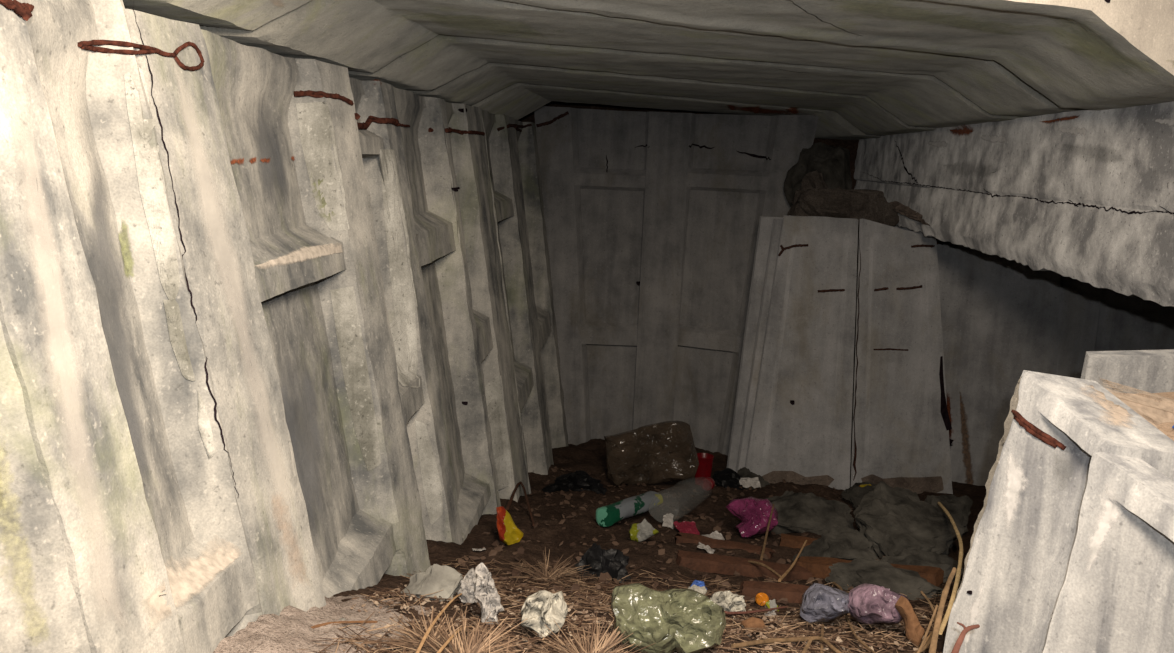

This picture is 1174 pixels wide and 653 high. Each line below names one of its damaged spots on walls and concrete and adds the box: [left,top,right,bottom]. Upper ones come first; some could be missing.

crack [133,10,197,326]
spalling [889,201,930,226]
crack [863,140,1174,214]
crack [204,358,239,497]